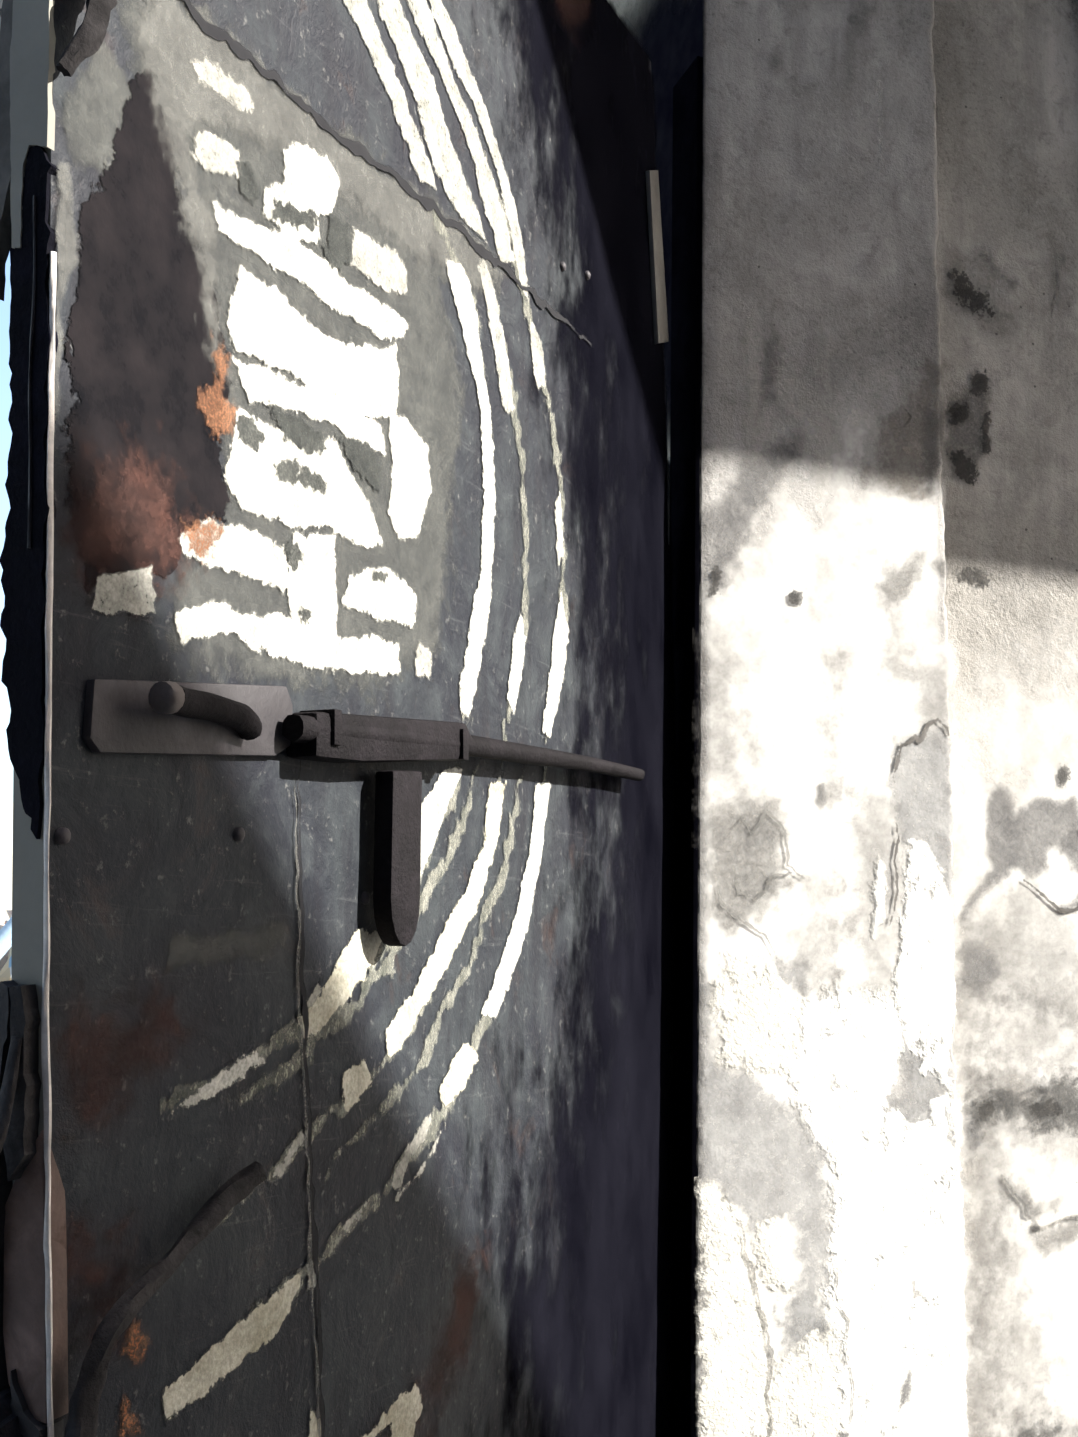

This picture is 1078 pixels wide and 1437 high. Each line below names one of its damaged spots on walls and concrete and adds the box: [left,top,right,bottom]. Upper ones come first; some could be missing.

corrosion [197,349,236,436]
water stain [880,364,992,499]
corrosion [67,452,224,577]
water stain [962,764,1078,919]
corrosion [123,1322,147,1363]
crack [723,1196,774,1437]
crack [835,1263,855,1422]
corrosion [121,1397,140,1437]